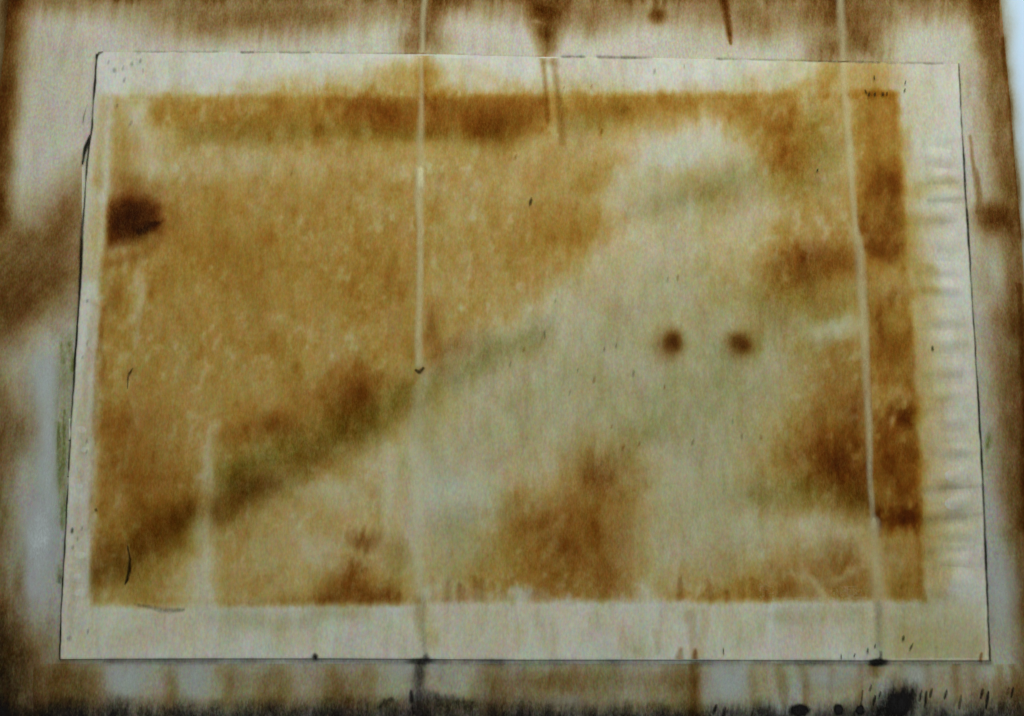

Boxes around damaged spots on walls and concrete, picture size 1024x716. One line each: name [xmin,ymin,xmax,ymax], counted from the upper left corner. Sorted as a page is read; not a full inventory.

rust [109,195,161,243]
rust [665,333,680,351]
rust [732,335,749,352]
water stain [866,419,917,500]